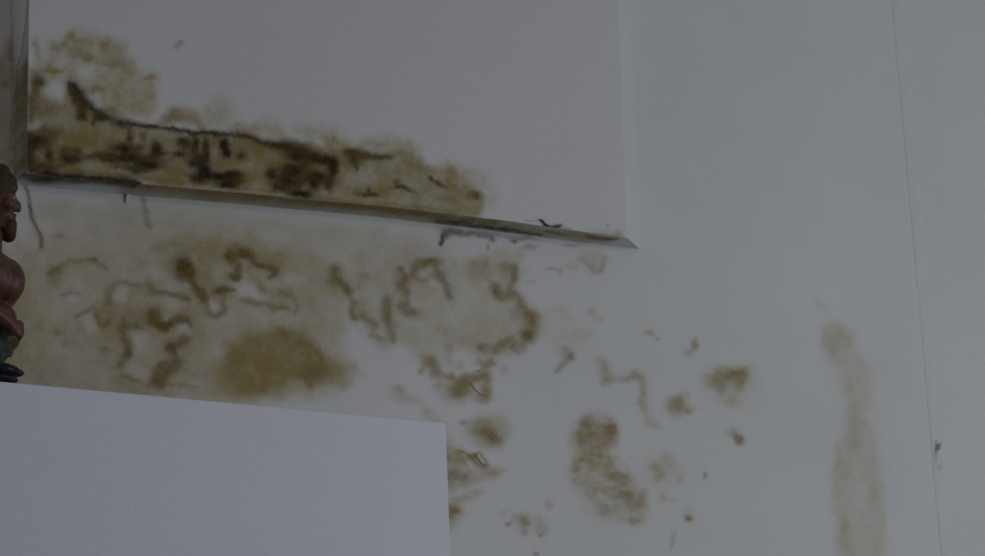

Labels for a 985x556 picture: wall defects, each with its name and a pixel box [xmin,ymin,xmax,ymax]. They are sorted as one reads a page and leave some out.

damp [15,59,537,235]
damp [98,240,286,389]
damp [208,330,326,394]